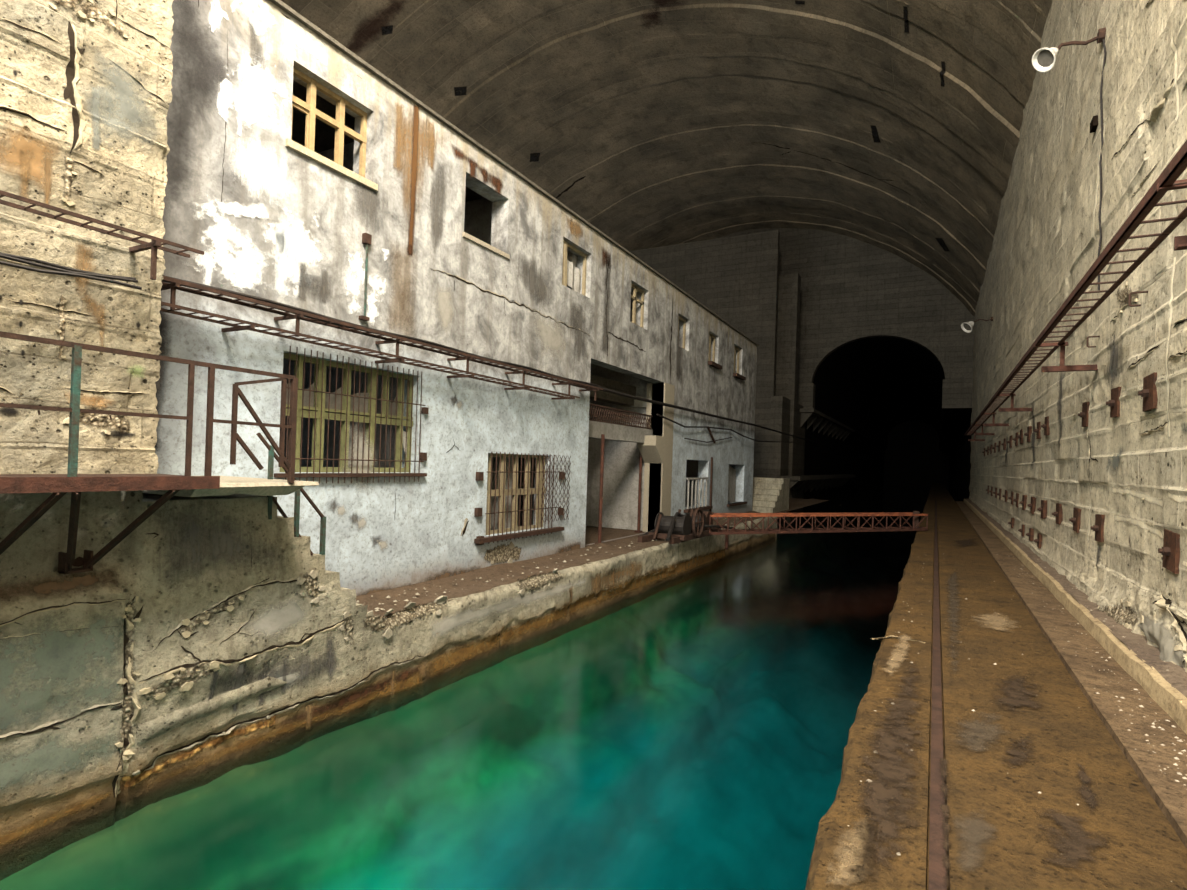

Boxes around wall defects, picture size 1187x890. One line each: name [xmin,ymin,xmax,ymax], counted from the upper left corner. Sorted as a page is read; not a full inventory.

peeling [214,0,290,19]
crack [0,0,168,175]
peeling [217,74,234,122]
rust [0,134,58,204]
rust [394,104,435,255]
peeling [197,199,269,289]
crack [1153,592,1187,663]
crack [0,548,425,798]